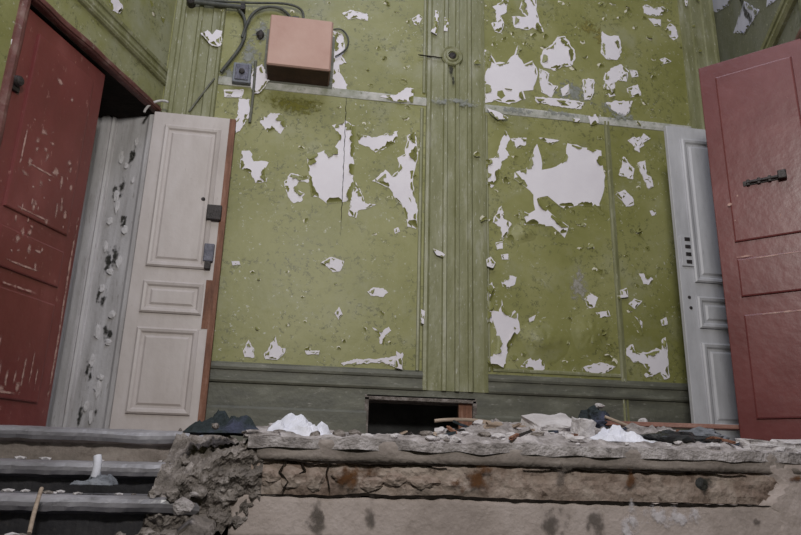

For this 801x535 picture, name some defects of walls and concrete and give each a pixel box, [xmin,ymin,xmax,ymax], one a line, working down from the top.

peeling [108,0,123,14]
peeling [642,5,682,48]
peeling [474,0,647,268]
peeling [284,120,420,234]
peeling [616,121,654,207]
peeling [487,275,545,371]
peeling [562,354,618,373]
peeling [626,337,670,380]
spalling [251,459,778,505]